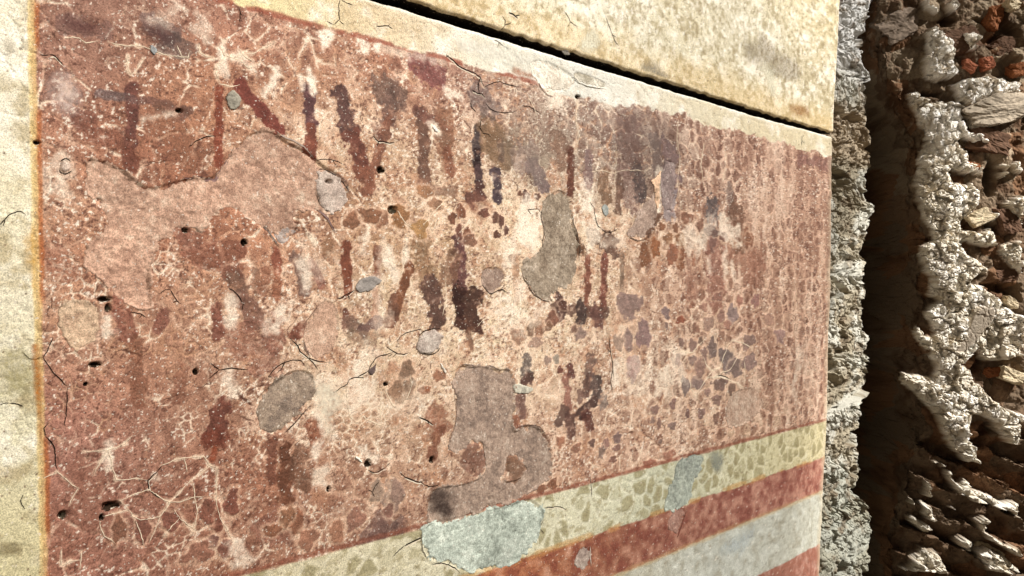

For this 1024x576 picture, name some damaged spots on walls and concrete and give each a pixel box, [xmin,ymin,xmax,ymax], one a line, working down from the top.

crack [445,55,541,137]
spalling [58,127,349,352]
spalling [521,192,581,302]
crack [590,163,647,233]
crack [22,338,233,545]
spalling [256,371,316,433]
spalling [420,363,553,574]
spalling [664,454,704,536]